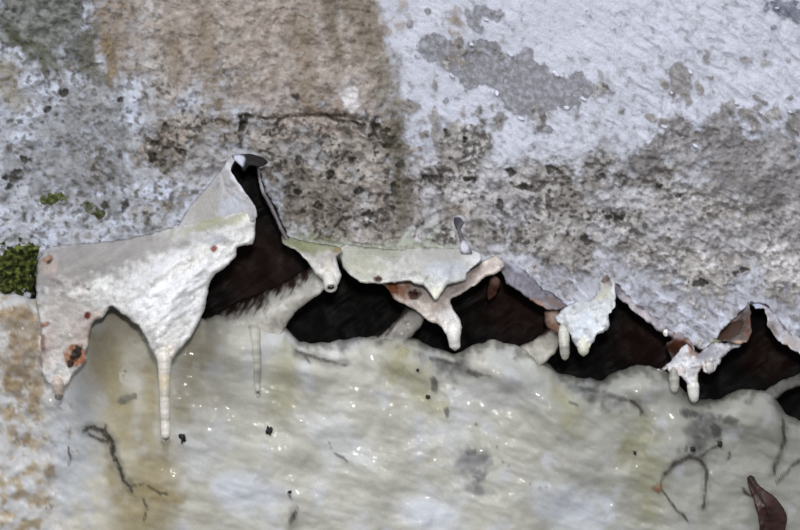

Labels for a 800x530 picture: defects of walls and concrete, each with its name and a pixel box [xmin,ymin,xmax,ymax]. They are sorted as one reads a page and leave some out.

spalling [0,86,154,226]
water stain [134,0,404,136]
peeling [36,5,800,443]
water stain [0,266,800,530]